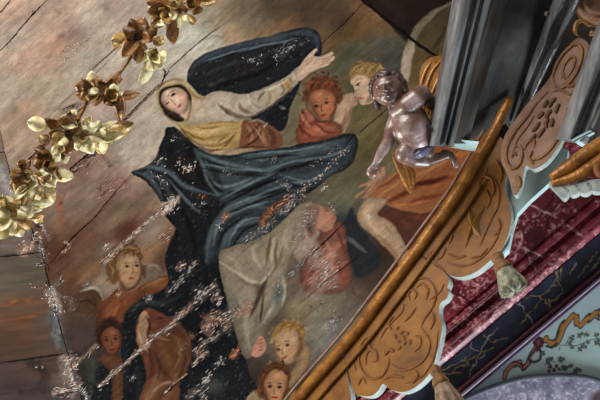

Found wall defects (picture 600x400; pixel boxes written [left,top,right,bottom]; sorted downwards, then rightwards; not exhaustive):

crack [0,4,43,51]
crack [70,151,96,173]
peeling [103,154,177,263]
peeling [246,153,338,243]
peeling [17,223,48,266]
crack [300,221,346,266]
peeling [32,276,76,315]
crack [0,177,131,396]
peeling [97,286,252,391]
peeling [53,345,98,400]